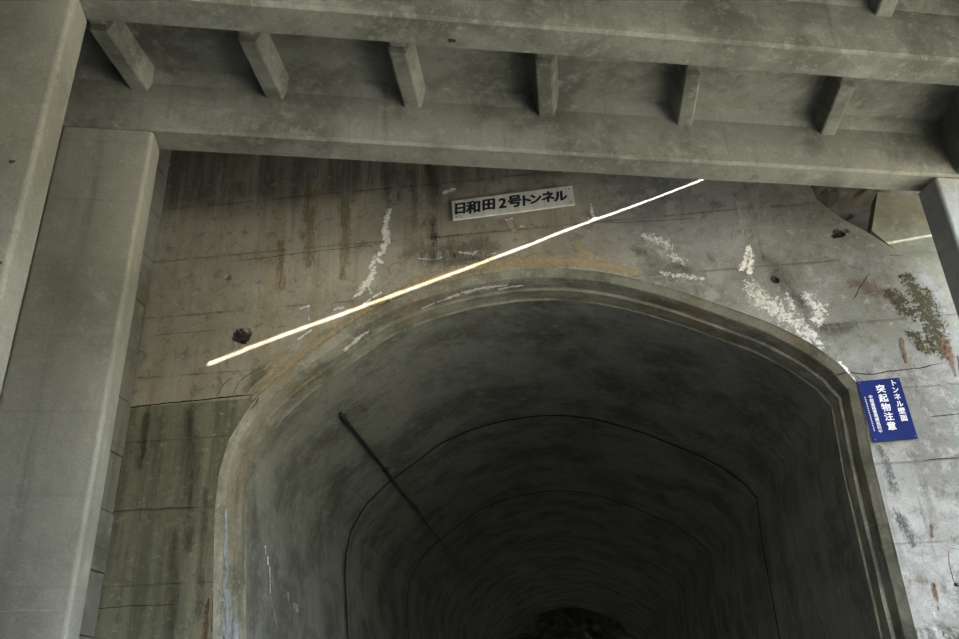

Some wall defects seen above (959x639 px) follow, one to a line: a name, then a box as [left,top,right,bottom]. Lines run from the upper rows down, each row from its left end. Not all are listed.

damp [353,207,392,306]
damp [735,192,829,350]
rust [940,337,959,377]